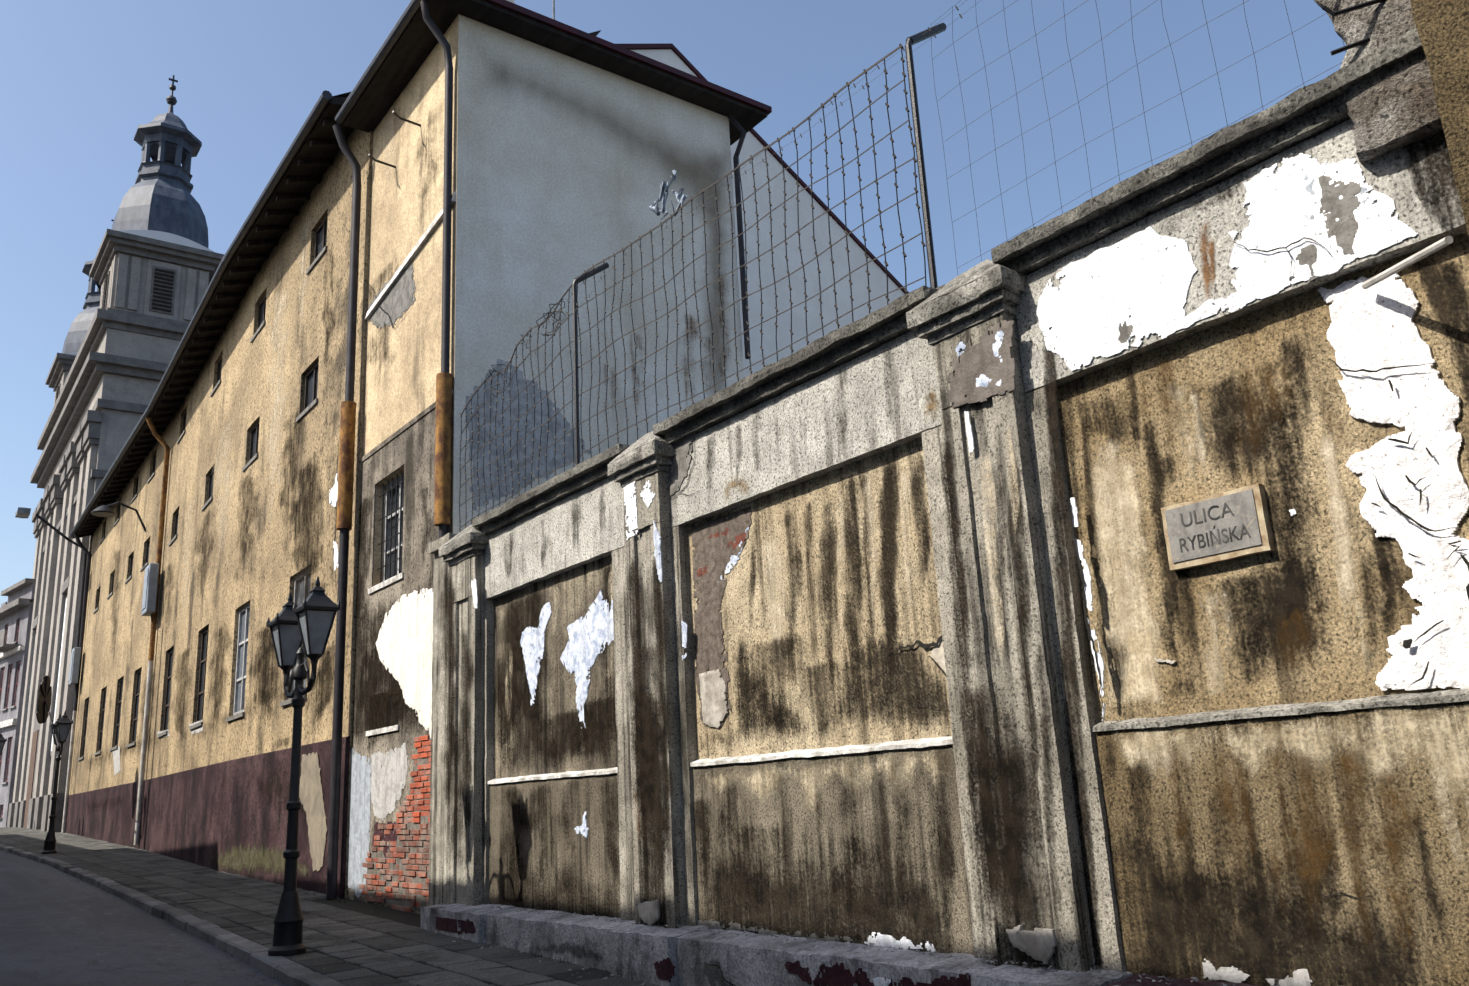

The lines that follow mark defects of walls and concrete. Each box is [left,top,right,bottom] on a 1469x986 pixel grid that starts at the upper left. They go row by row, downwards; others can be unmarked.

damp [165,200,325,633]
peeling [1037,153,1418,371]
crack [1328,358,1437,392]
damp [1402,132,1467,235]
damp [1413,262,1469,401]
flaking render [359,734,476,935]
peeling [520,590,614,729]
damp [494,551,672,928]
spalling [681,506,752,729]
damp [693,327,1469,986]
crack [1371,432,1469,685]
peeling [1202,958,1312,986]